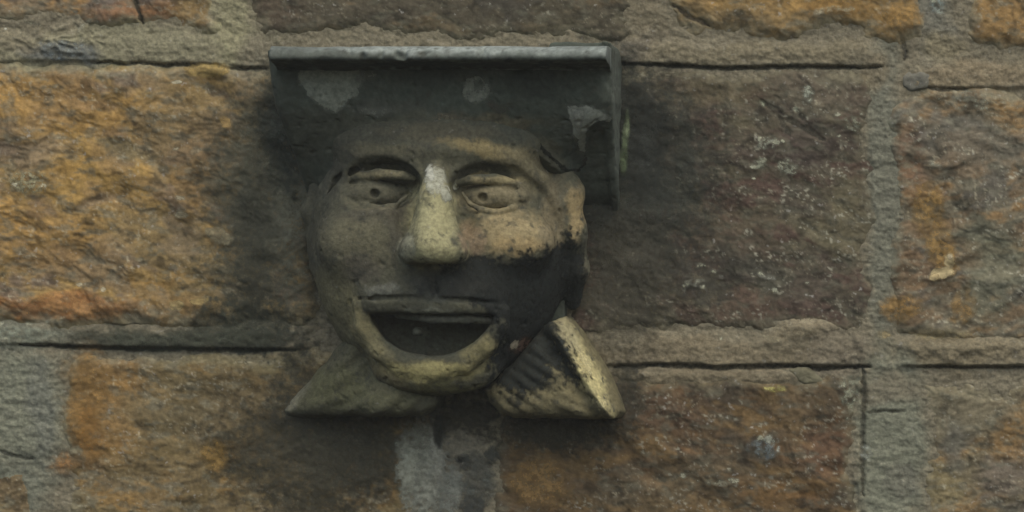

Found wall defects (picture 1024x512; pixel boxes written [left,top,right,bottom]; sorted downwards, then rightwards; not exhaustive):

water stain [71,36,733,512]
spalling [567,105,612,153]